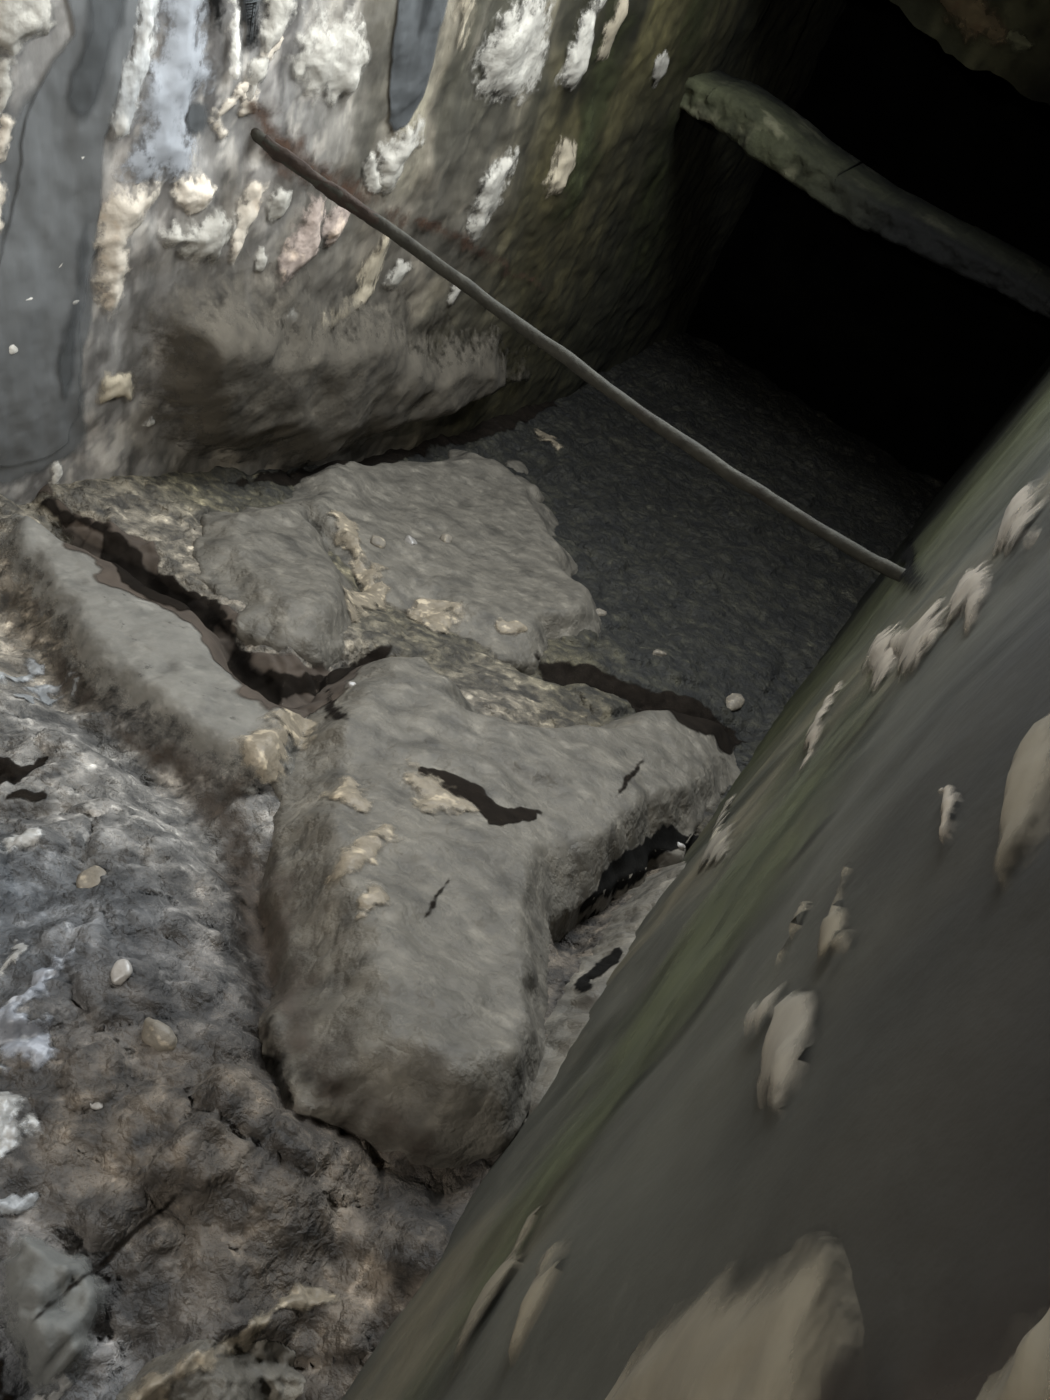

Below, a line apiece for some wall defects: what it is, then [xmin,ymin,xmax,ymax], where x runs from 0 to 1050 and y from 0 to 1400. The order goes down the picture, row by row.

water stain [229,0,241,79]
water stain [389,0,448,131]
rust [249,102,369,205]
water stain [563,38,616,217]
water stain [0,0,142,485]
water stain [535,428,561,449]
water stain [328,510,391,622]
water stain [408,597,465,634]
water stain [496,618,528,635]
water stain [904,1328,1027,1400]